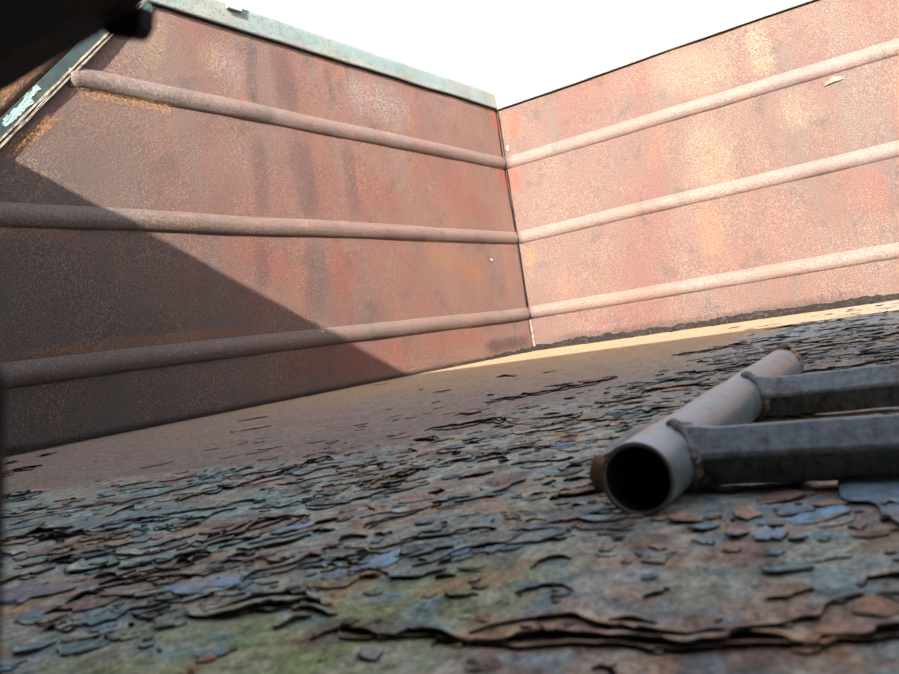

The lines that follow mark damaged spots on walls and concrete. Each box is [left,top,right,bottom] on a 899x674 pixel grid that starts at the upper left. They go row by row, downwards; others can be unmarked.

rust [671,323,815,374]
rust [800,339,899,371]
rust [407,376,618,452]
rust [174,455,335,501]
rust [667,474,899,542]
rust [3,488,899,663]
rust [590,664,617,674]